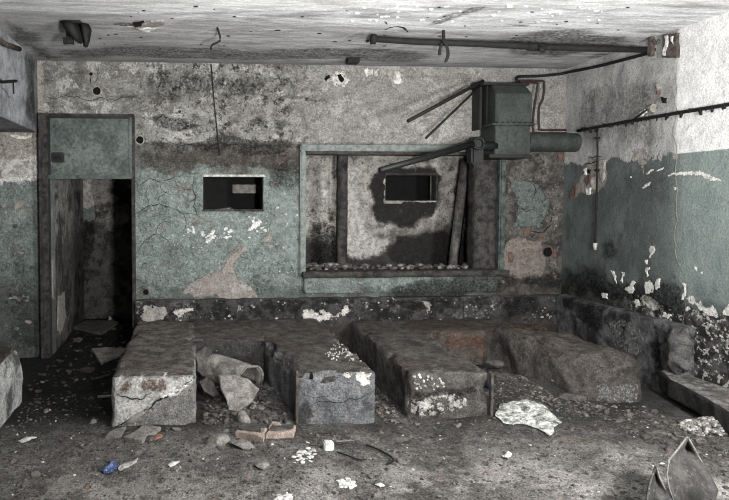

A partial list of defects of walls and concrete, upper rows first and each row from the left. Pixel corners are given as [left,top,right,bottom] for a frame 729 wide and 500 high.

crack [135,172,206,252]
damp [143,136,299,175]
flaking render [172,208,279,308]
damp [388,230,451,266]
damp [459,191,468,266]
flaking render [504,207,560,285]
flaking render [570,155,608,199]
damp [563,267,685,329]
peeling [611,246,672,319]
peeling [681,283,729,366]
crack [113,380,192,428]
corrosion [142,378,166,391]